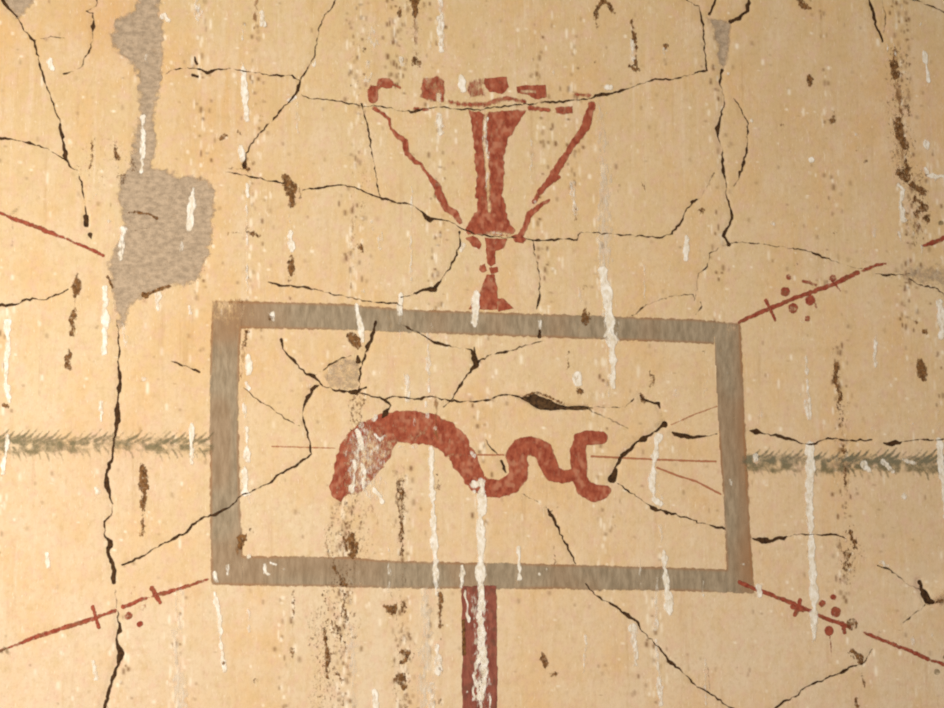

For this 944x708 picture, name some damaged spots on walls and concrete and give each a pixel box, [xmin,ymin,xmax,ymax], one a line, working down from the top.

spalling [1,0,33,19]
crack [0,0,97,238]
spalling [106,0,215,327]
spalling [711,20,730,66]
rust [887,49,930,239]
crack [103,0,830,584]
water stain [598,163,618,389]
crack [103,613,124,708]
rust [319,566,355,681]
rust [393,649,411,690]
water stain [459,478,487,611]
water stain [805,441,819,640]